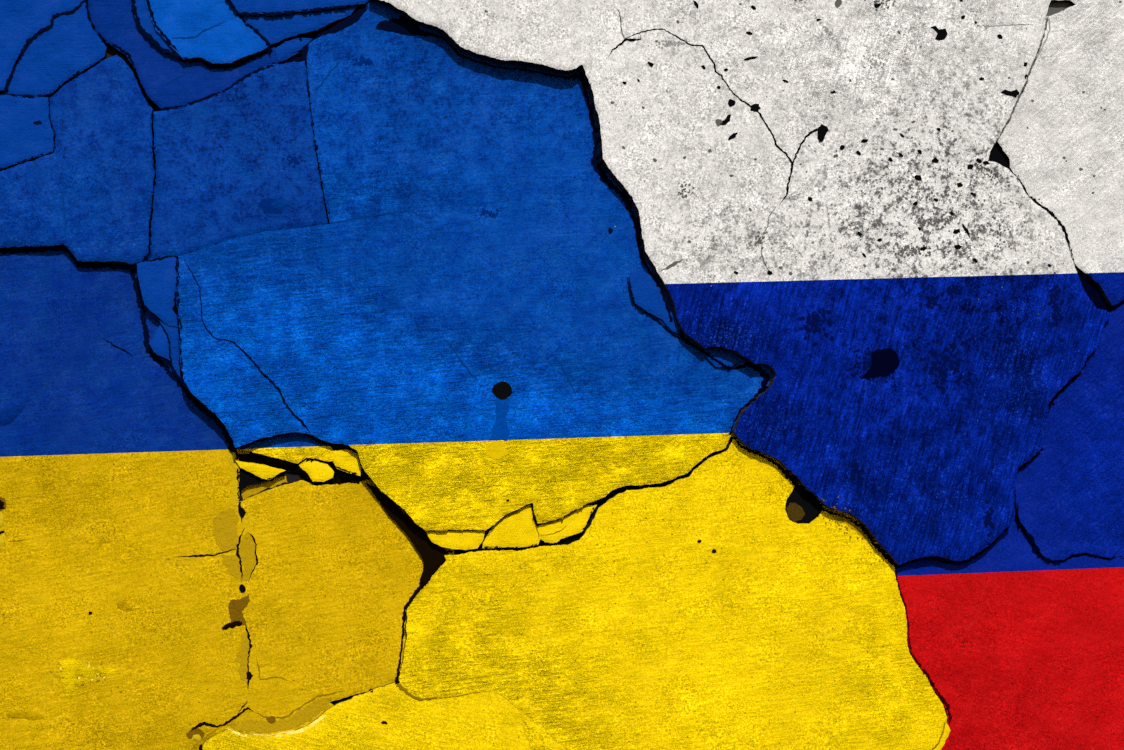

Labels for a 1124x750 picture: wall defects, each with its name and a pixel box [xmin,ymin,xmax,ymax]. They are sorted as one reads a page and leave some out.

crack [0,0,419,579]
crack [191,621,340,750]
flaking render [0,247,597,750]
crack [395,9,1124,750]